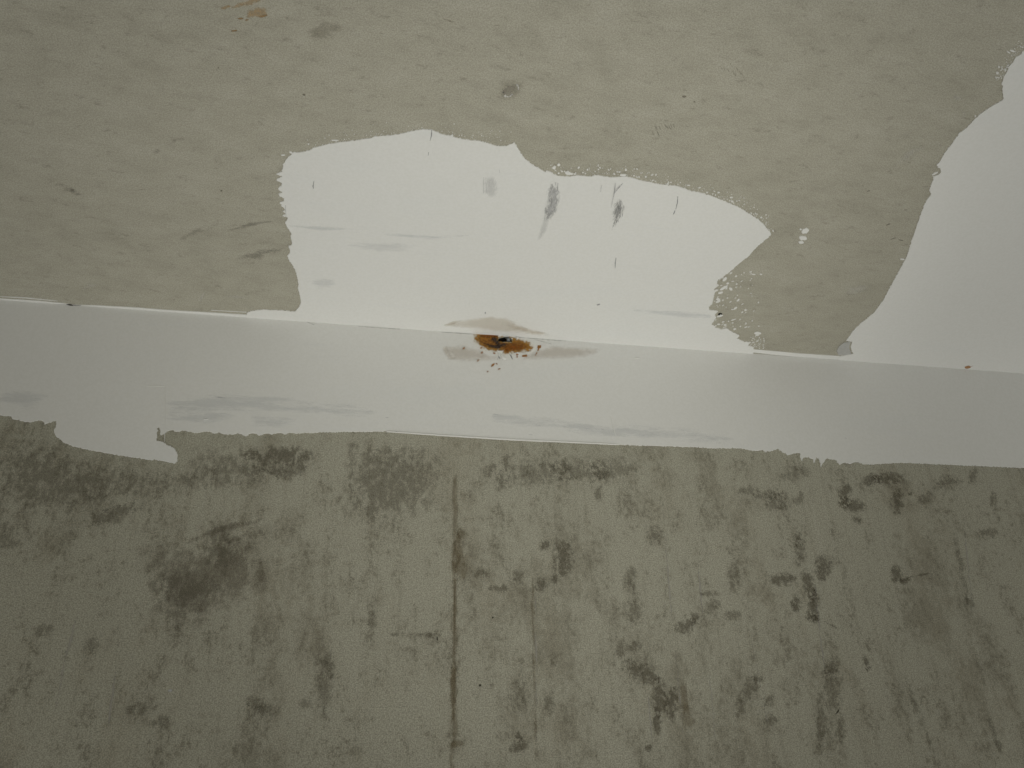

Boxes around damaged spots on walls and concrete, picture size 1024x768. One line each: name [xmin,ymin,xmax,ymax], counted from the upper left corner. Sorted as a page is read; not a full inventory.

corrosion [463,334,541,372]
peeling [497,335,519,360]